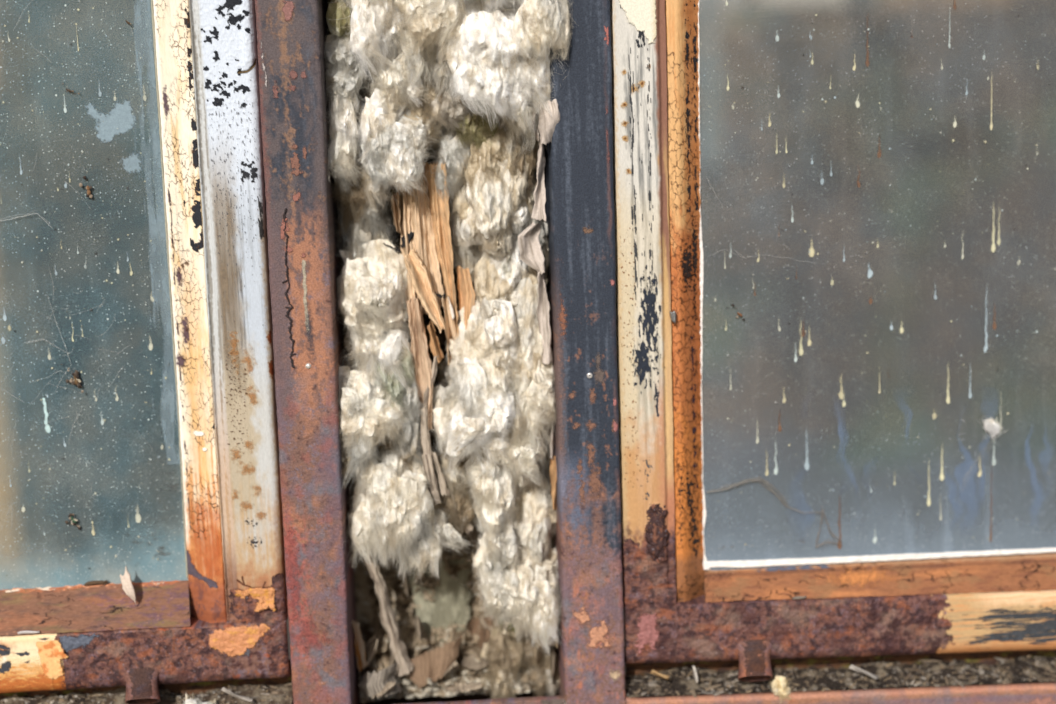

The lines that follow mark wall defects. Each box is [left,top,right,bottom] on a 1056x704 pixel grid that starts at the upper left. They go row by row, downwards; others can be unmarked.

peeling [184,0,251,108]
peeling [619,0,657,71]
crack [157,1,296,540]
corrosion [557,304,567,335]
peeling [629,188,665,417]
crack [668,103,970,602]
corrosion [577,444,602,505]
corrosion [573,538,953,664]
crack [1001,560,1055,592]
peeling [0,634,99,679]
corrosion [0,627,233,693]
spalling [360,690,557,704]